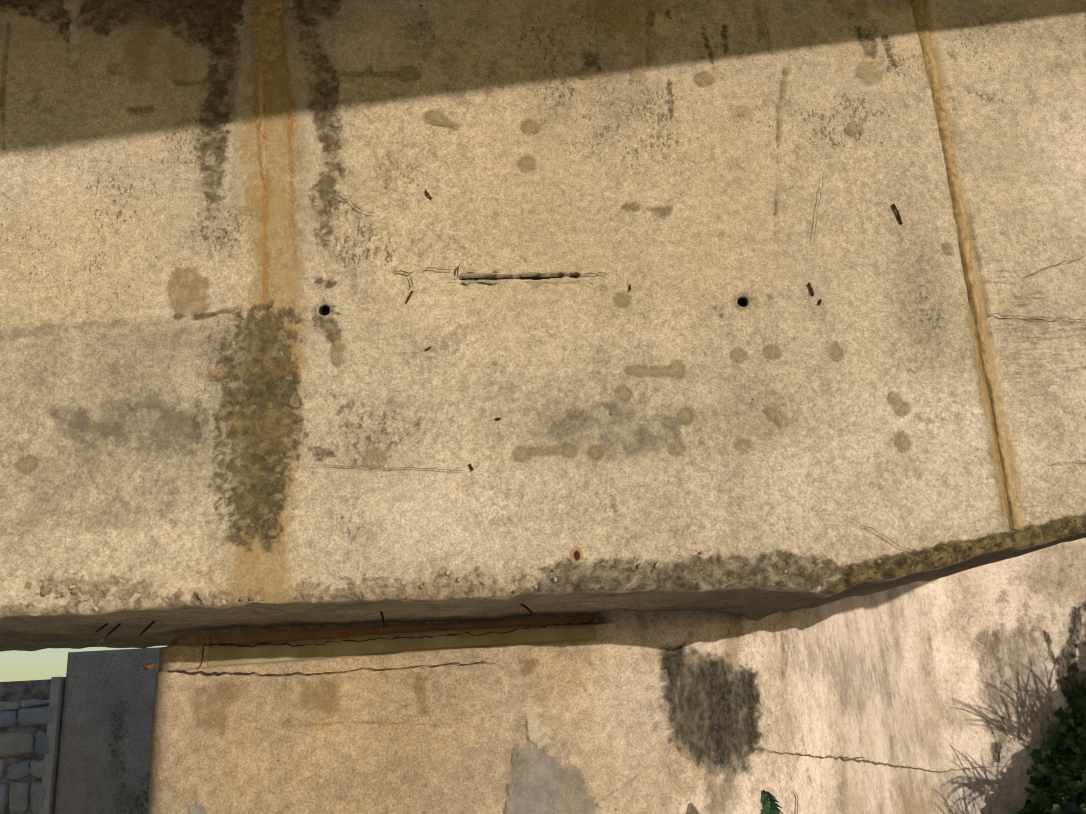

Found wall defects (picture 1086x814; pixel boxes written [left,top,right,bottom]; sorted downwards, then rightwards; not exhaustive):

leakage [0,0,252,251]
rust [241,16,297,308]
leakage [285,0,399,265]
crack [392,264,610,288]
leakage [77,267,420,552]
rust [230,322,300,602]
crack [168,615,595,676]
leakage [660,646,762,814]